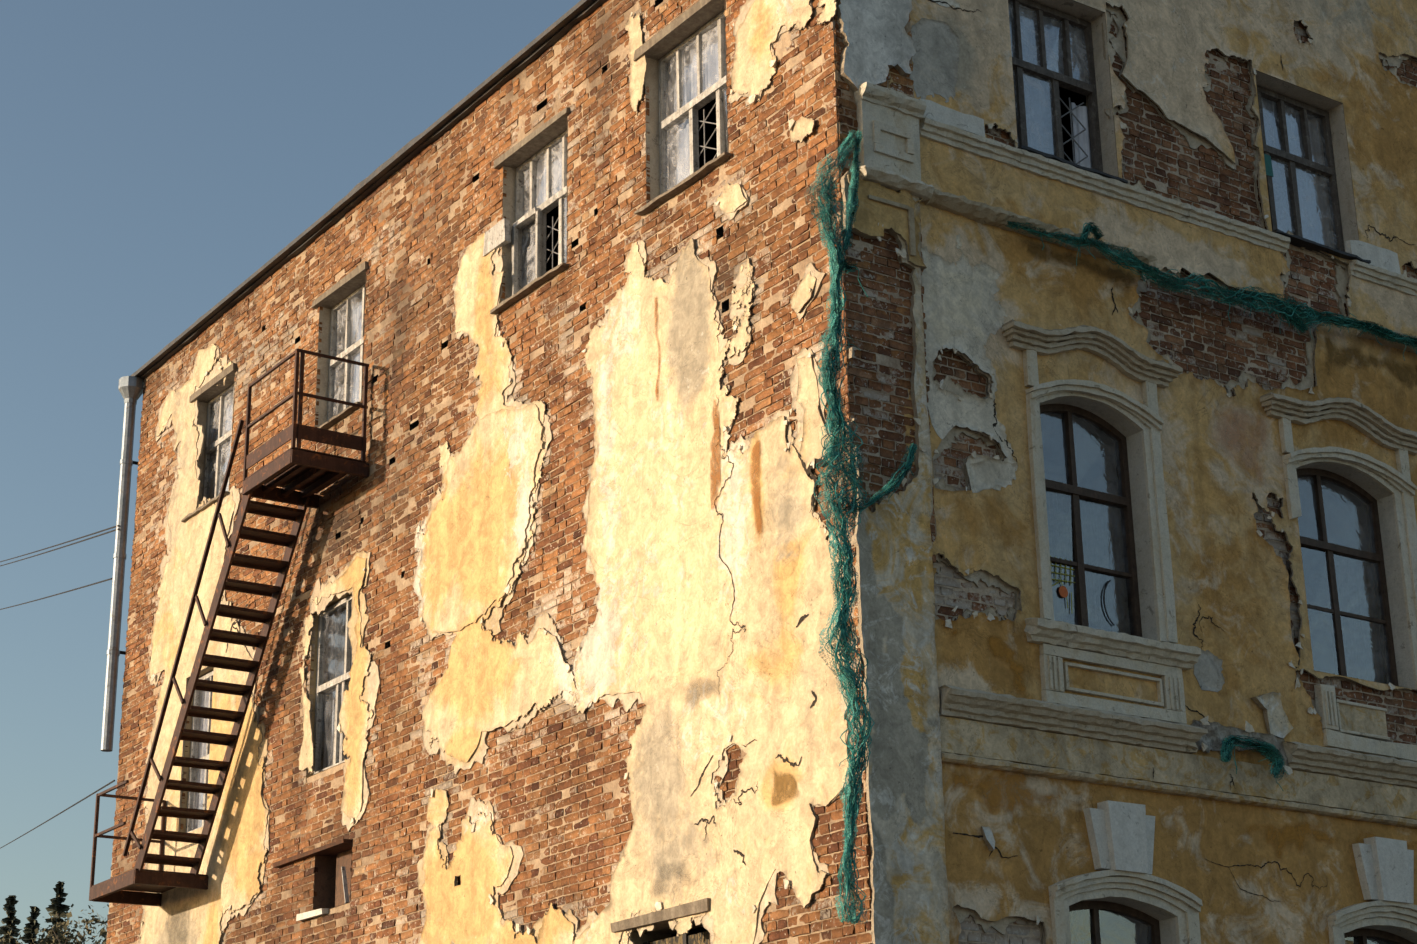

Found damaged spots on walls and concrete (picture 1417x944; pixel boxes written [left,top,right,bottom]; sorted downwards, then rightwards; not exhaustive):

flaking render [1293,19,1314,45]
flaking render [1379,53,1417,88]
flaking render [1101,4,1269,230]
flaking render [714,183,750,240]
flaking render [1128,230,1352,398]
flaking render [401,192,1020,944]
flaking render [1235,493,1417,750]
crack [690,739,802,866]
corrosion [272,839,352,868]
crack [1206,859,1328,902]
flaking render [952,905,1045,944]